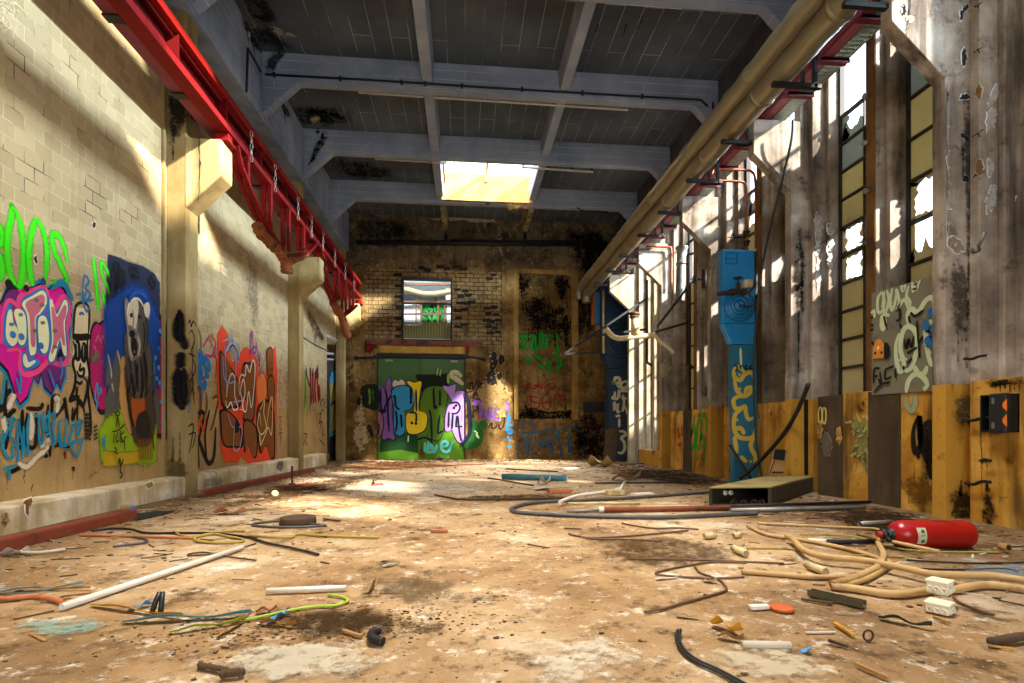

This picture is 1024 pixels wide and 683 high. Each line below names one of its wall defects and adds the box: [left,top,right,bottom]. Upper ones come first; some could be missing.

leakage [242,0,298,71]
leakage [282,104,348,165]
spalling [946,82,999,255]
peeling [814,212,835,291]
leakage [519,274,589,350]
leakage [950,480,995,524]